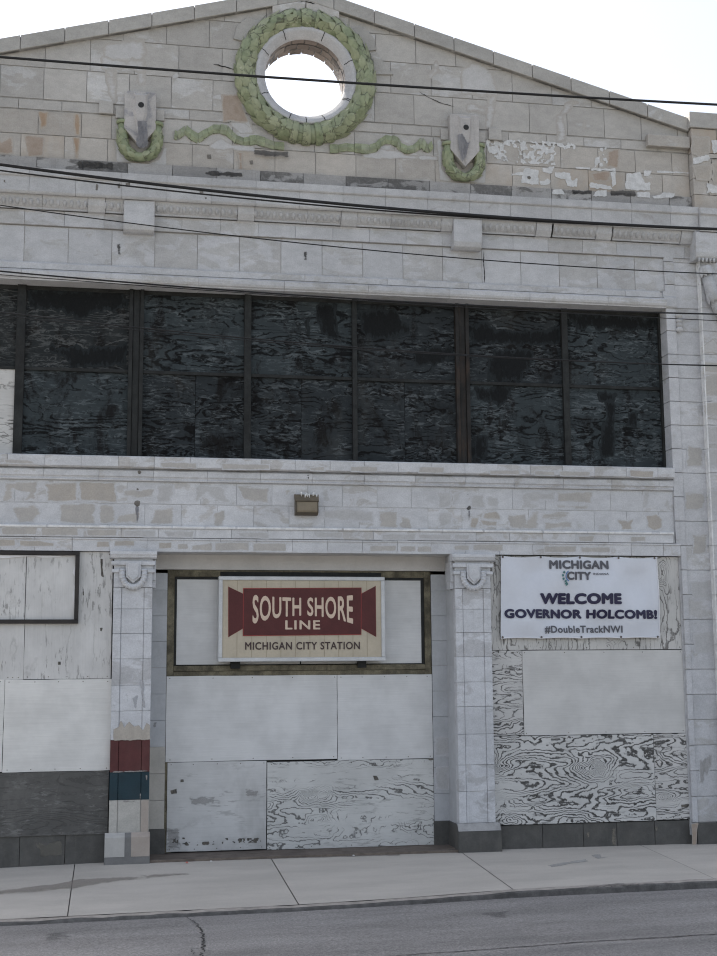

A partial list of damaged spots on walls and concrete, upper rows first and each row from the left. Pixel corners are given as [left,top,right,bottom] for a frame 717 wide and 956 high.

peeling [511,140,564,195]
peeling [575,148,616,197]
peeling [691,135,717,185]